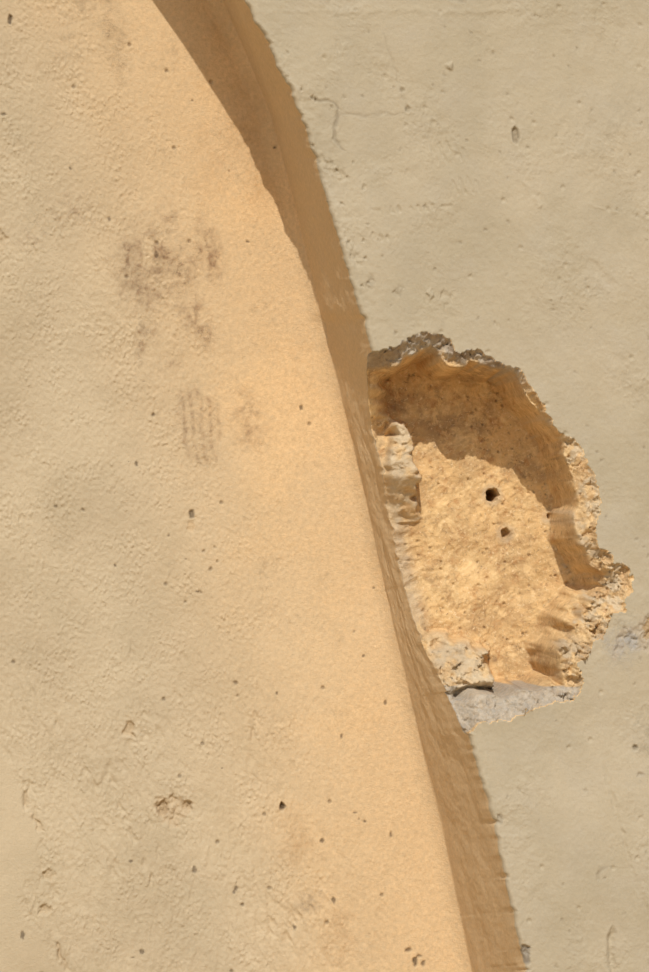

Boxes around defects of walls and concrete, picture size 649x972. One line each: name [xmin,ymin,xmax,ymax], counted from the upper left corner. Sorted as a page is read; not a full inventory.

spalling [367,332,649,735]